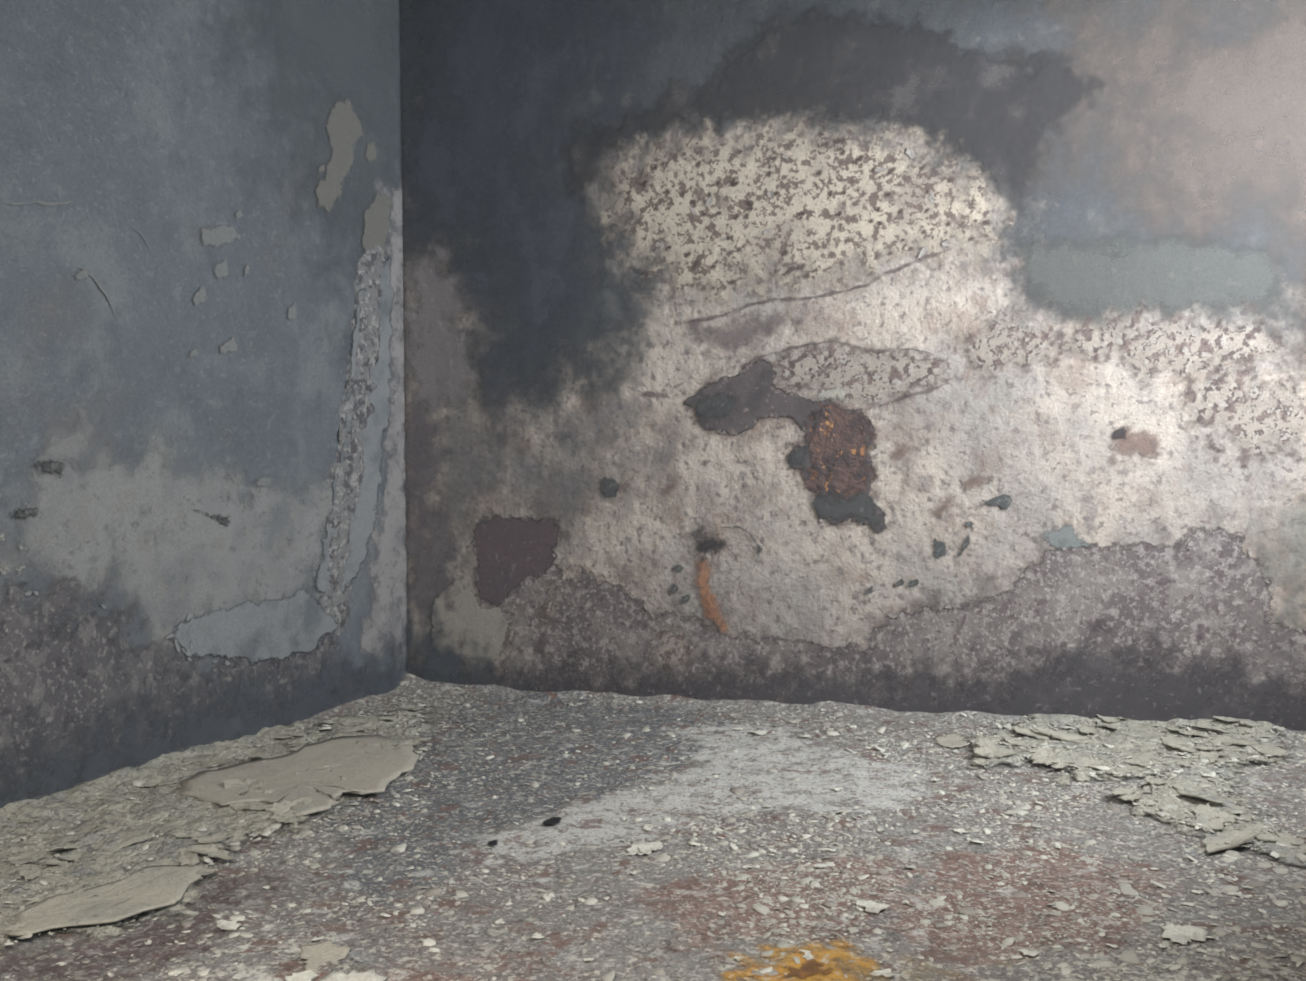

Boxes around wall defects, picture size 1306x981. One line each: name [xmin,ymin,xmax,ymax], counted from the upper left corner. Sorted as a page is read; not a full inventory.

leakage [562,8,1093,202]
leakage [690,315,801,352]
crack [633,253,938,322]
spalling [686,338,950,534]
peeling [0,181,482,981]
rust [690,526,728,631]
peeling [431,514,1306,867]
rust [723,939,880,981]